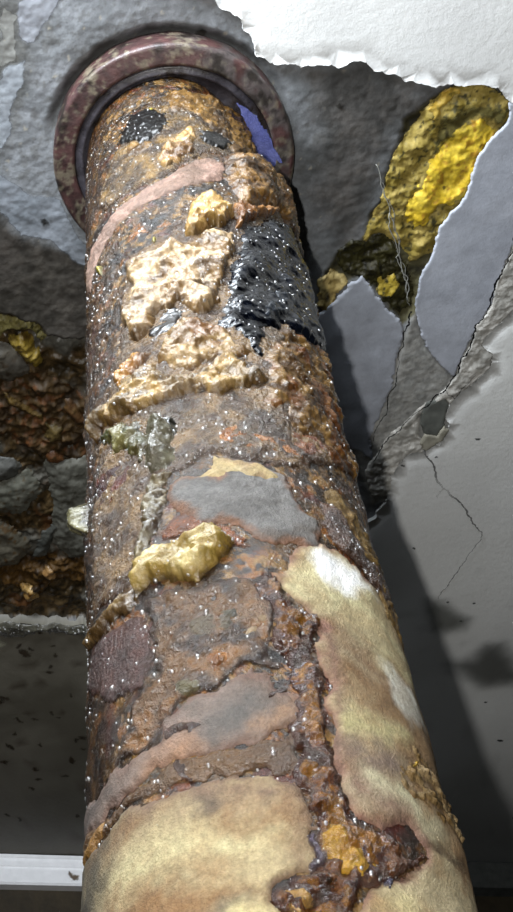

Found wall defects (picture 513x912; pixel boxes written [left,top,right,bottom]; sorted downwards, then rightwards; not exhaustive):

corrosion [164,89,304,259]
spalling [0,0,513,519]
spalling [0,433,68,566]
peeling [66,502,90,536]
corrosion [143,413,177,473]
corrosion [161,514,251,548]
corrosion [219,327,359,483]
crack [424,449,482,599]
spalling [0,578,86,621]
corrosion [87,577,283,766]
corrosion [83,733,299,861]
corrosion [400,742,465,845]